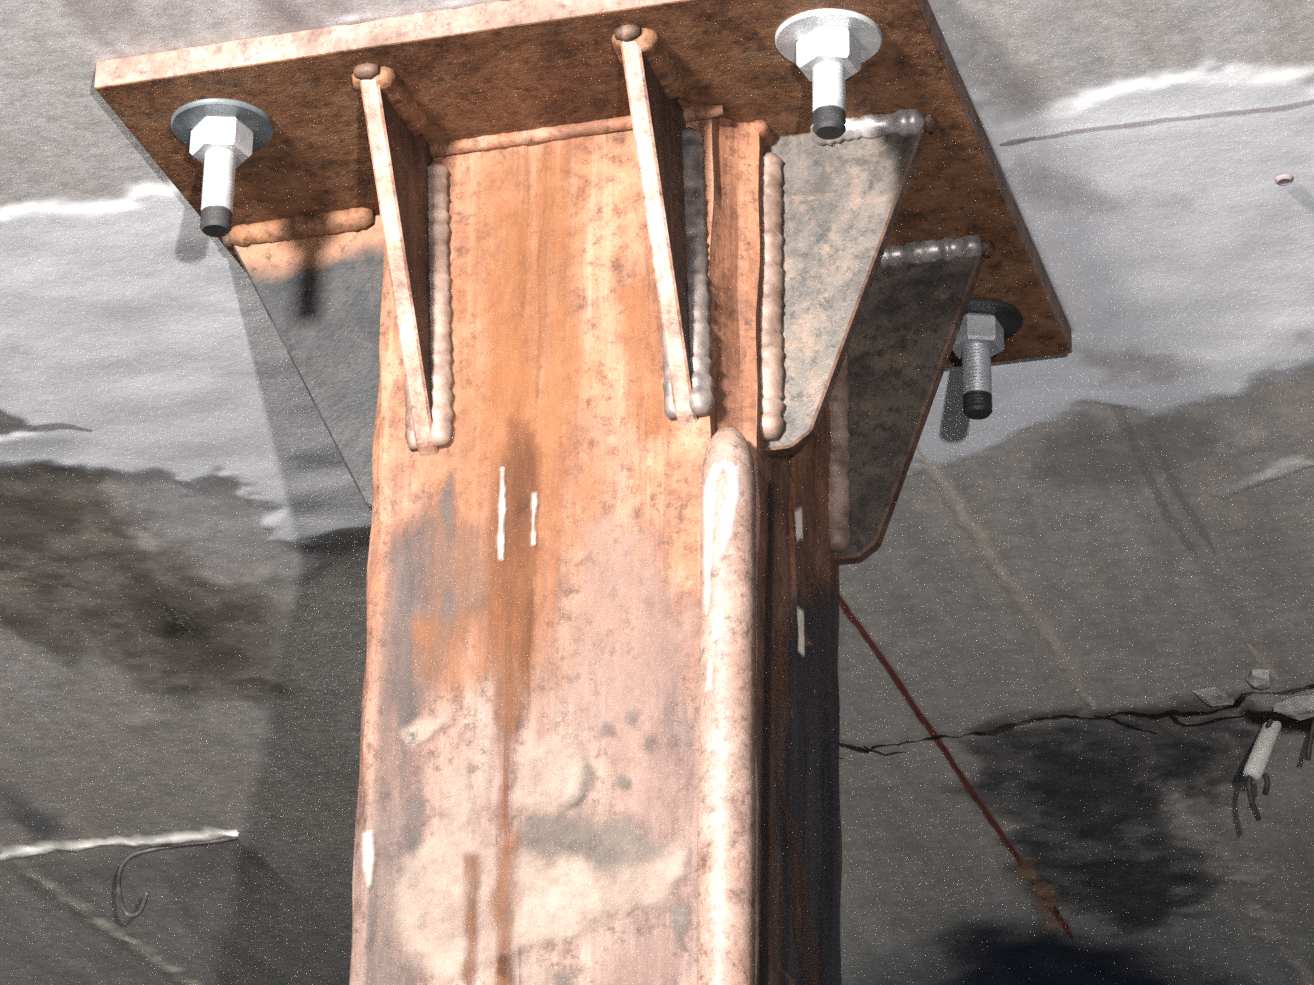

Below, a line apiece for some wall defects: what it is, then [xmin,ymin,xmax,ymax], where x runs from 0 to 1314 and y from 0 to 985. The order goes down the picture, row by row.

leakage [1000,137,1036,145]
crack [0,423,93,434]
leakage [0,462,278,698]
corrosion [490,424,536,728]
crack [839,684,1314,759]
spalling [1192,686,1314,733]
spalling [1246,669,1275,689]
leakage [966,698,1274,928]
corrosion [464,858,476,971]
corrosion [494,785,509,985]